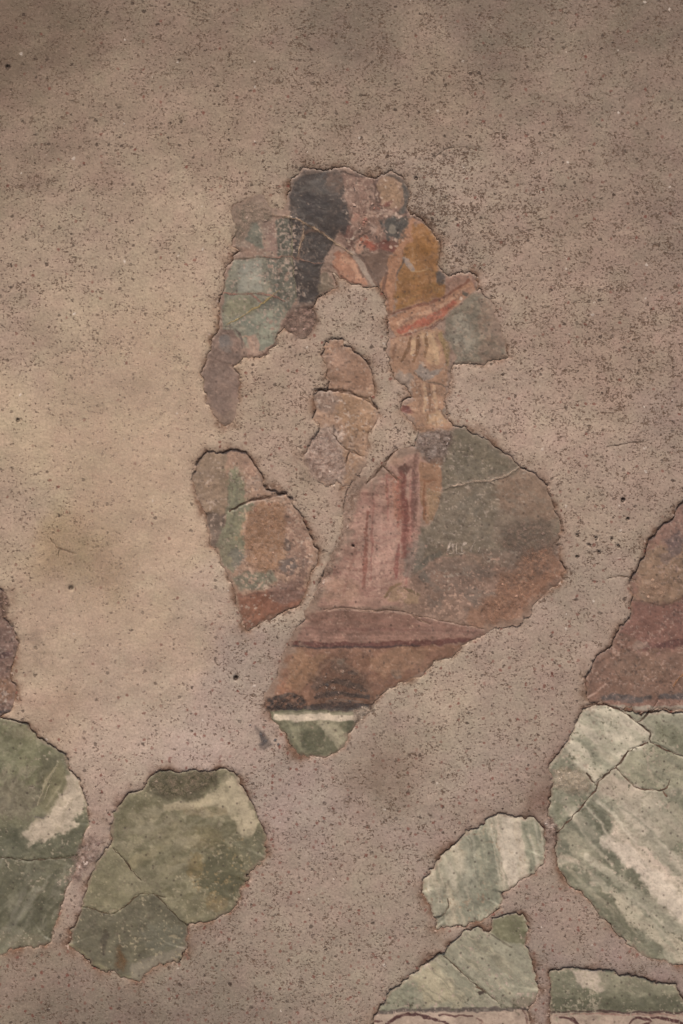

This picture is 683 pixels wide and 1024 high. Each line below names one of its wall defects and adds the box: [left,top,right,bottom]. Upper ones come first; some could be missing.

crack [263,214,353,264]
crack [305,389,378,409]
crack [229,493,286,512]
crack [330,432,398,484]
crack [445,467,519,489]
crack [555,674,683,834]
crack [81,848,187,926]
crack [443,956,498,1002]